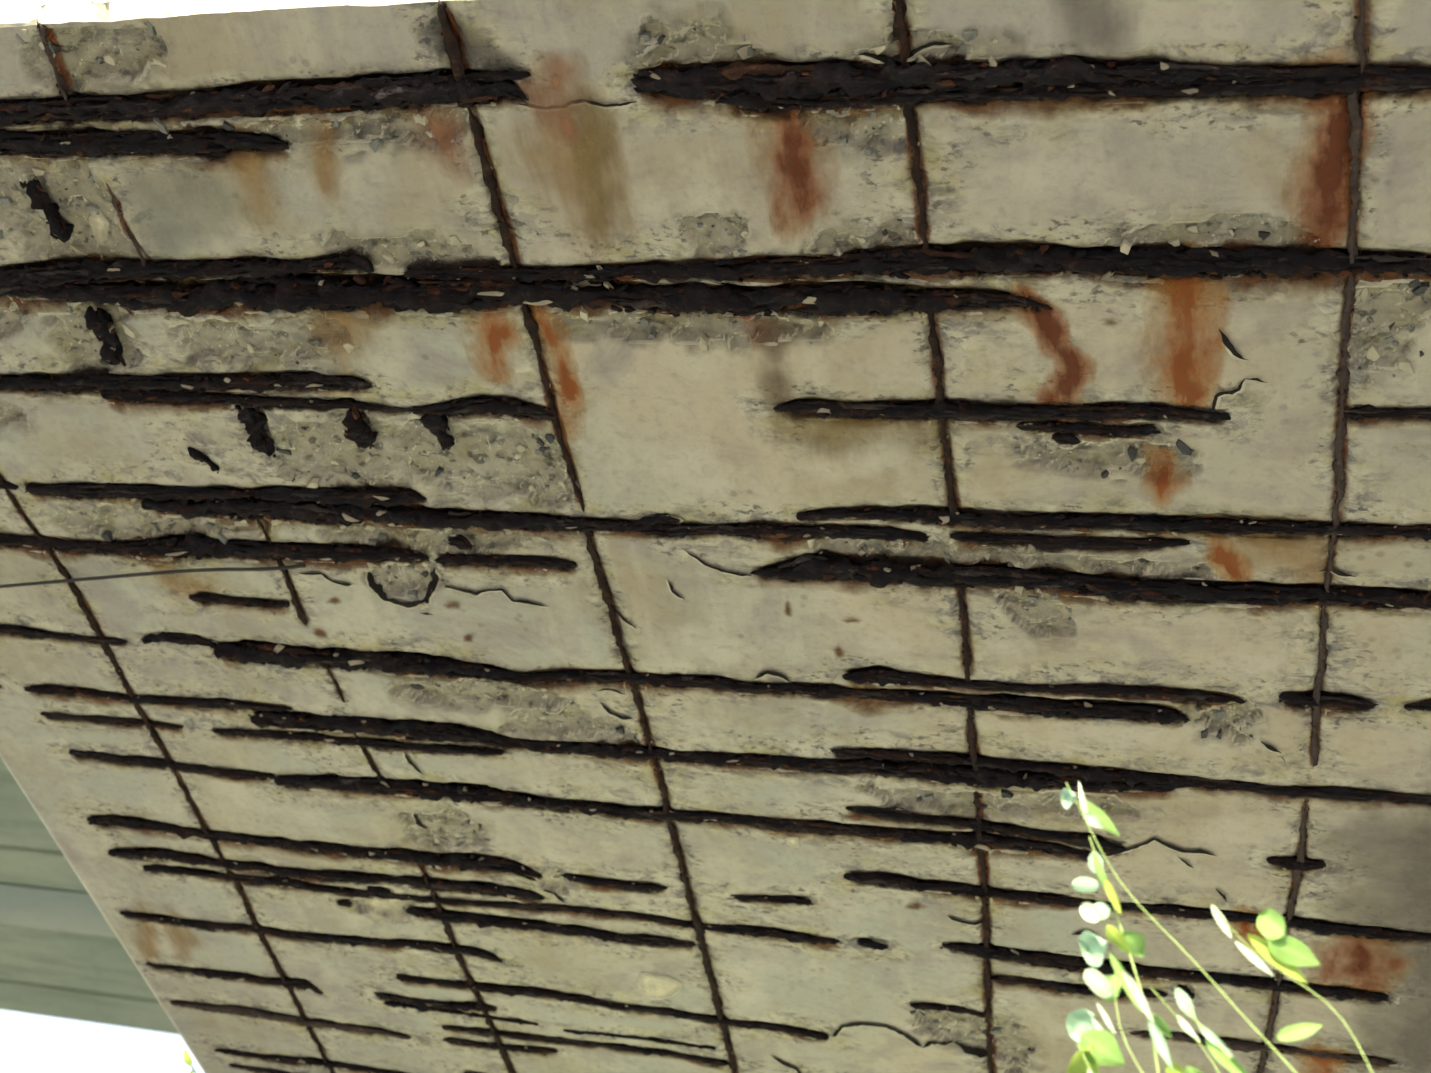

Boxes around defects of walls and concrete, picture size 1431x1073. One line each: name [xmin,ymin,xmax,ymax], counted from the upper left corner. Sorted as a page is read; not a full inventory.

crack [518,99,638,112]
rust [0,55,1431,458]
spalling [928,312,960,516]
crack [1211,329,1268,413]
spalling [1309,0,1431,767]
crack [296,569,549,615]
rust [0,451,1431,614]
spalling [276,303,739,1073]
spalling [0,475,335,1073]
crack [832,1023,989,1058]
rust [843,871,1267,951]
rust [940,915,1431,1004]